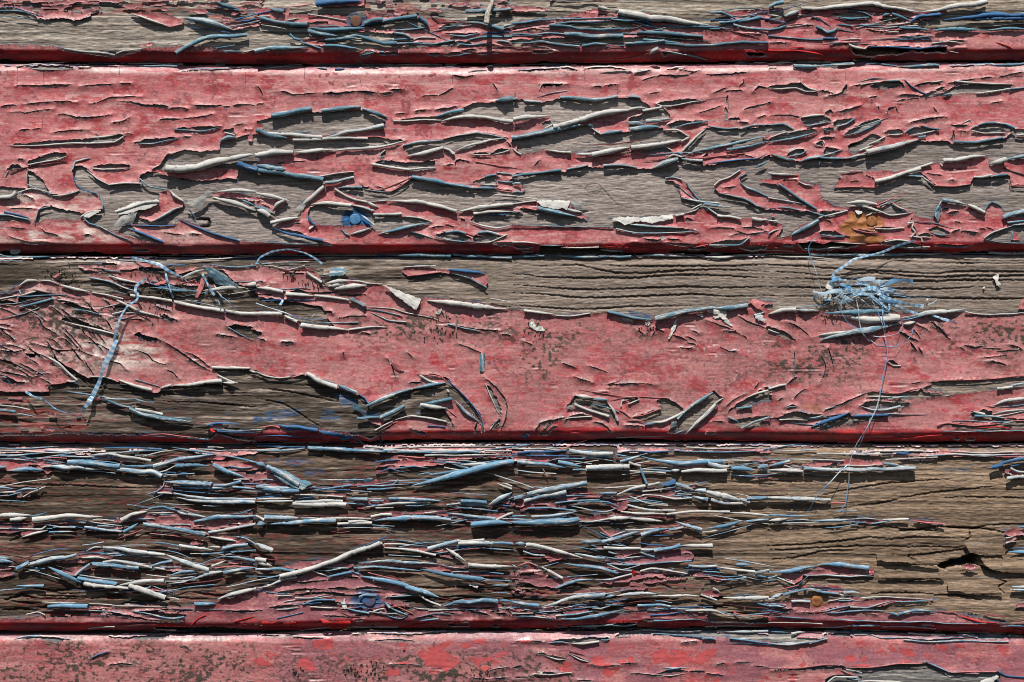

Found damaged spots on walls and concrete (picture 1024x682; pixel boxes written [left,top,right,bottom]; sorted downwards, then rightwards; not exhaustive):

peeling [0,0,1024,99]
peeling [0,71,1024,351]
rust [839,213,885,243]
peeling [0,332,1024,654]